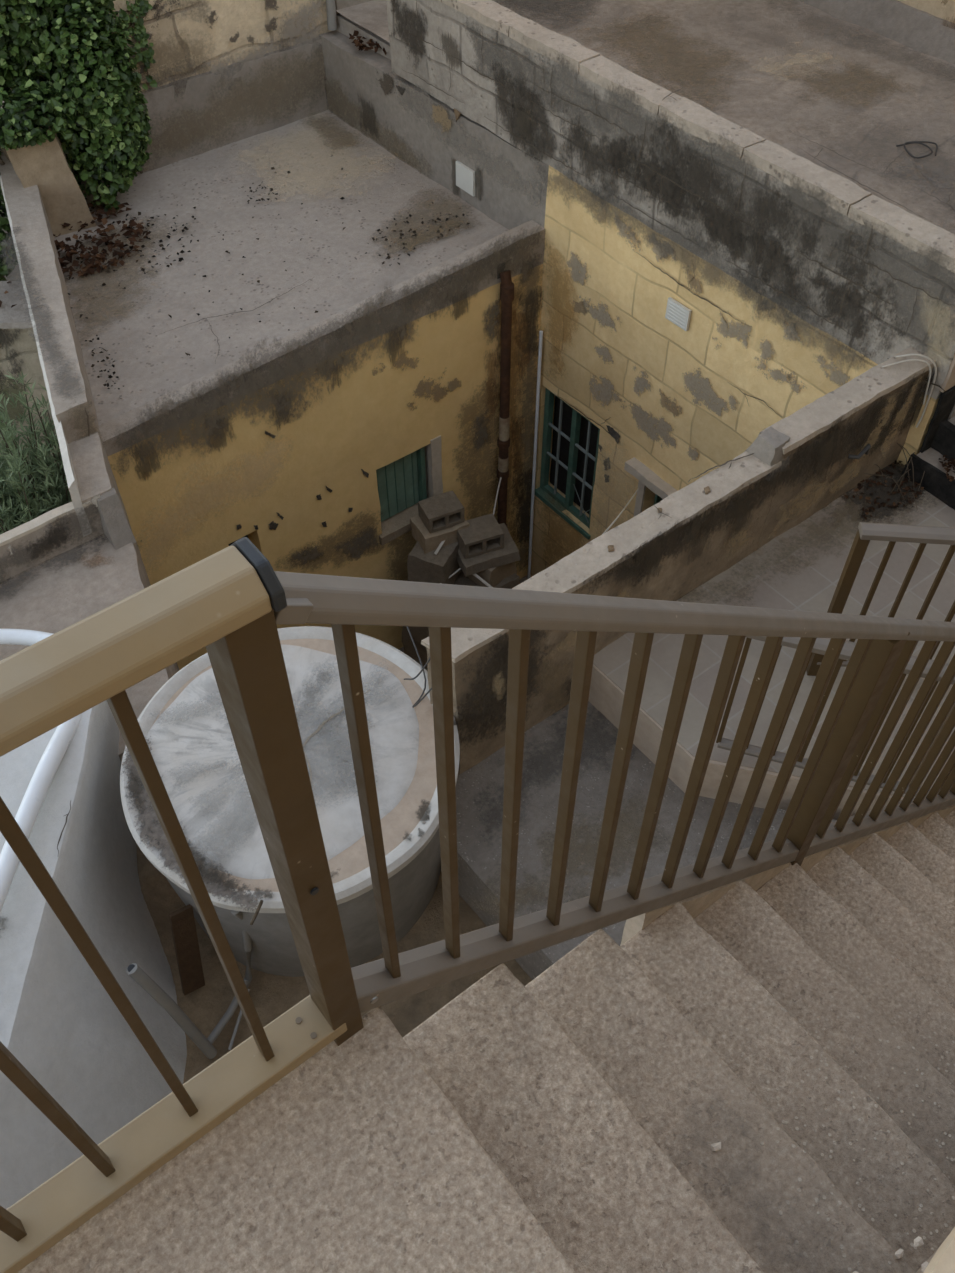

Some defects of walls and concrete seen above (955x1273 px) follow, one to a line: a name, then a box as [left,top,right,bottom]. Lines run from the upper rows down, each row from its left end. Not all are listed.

water stain [391,0,426,67]
water stain [442,34,460,67]
water stain [377,158,482,253]
water stain [466,15,955,369]
water stain [63,222,165,333]
water stain [118,228,542,570]
water stain [295,664,357,798]
water stain [126,769,144,811]
water stain [188,785,272,898]
water stain [403,800,431,841]